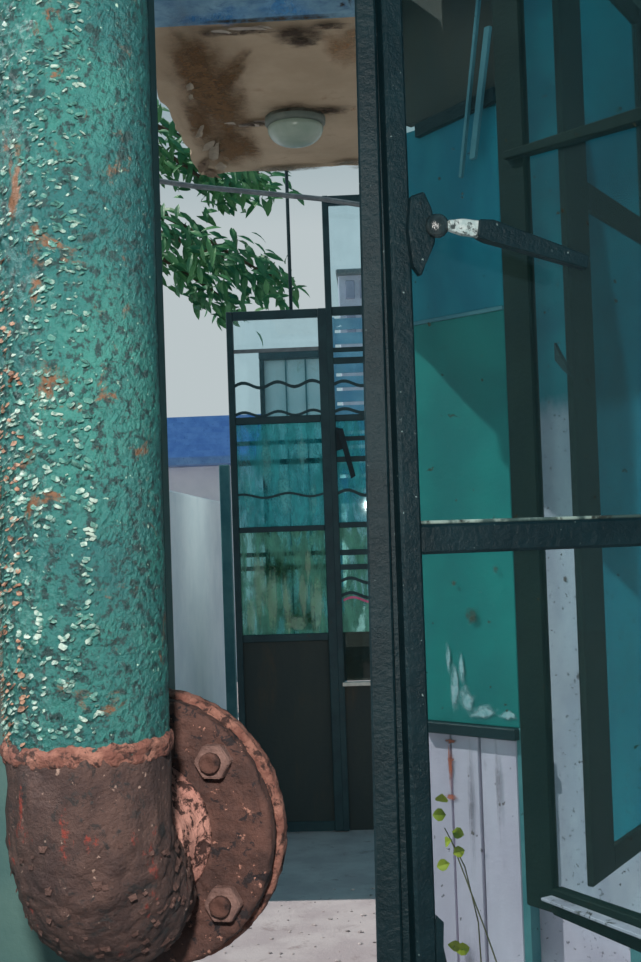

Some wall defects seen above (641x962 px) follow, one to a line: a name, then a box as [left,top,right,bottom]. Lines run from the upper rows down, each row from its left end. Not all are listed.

damp [174,0,355,162]
peeling [446,649,515,720]